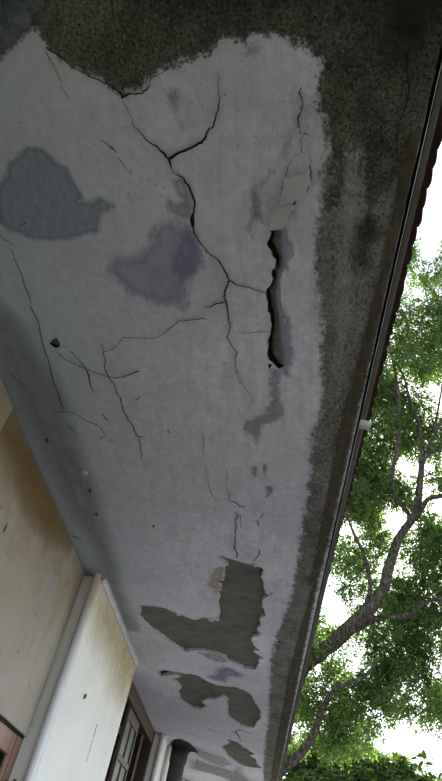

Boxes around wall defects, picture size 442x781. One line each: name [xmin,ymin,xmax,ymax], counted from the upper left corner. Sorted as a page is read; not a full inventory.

water stain [0,0,442,211]
crack [277,84,312,219]
crack [0,47,266,459]
water stain [0,315,103,546]
water stain [245,370,283,442]
peeling [139,556,273,671]
peeling [172,673,262,728]
water stain [190,750,248,781]
peeling [221,739,261,768]